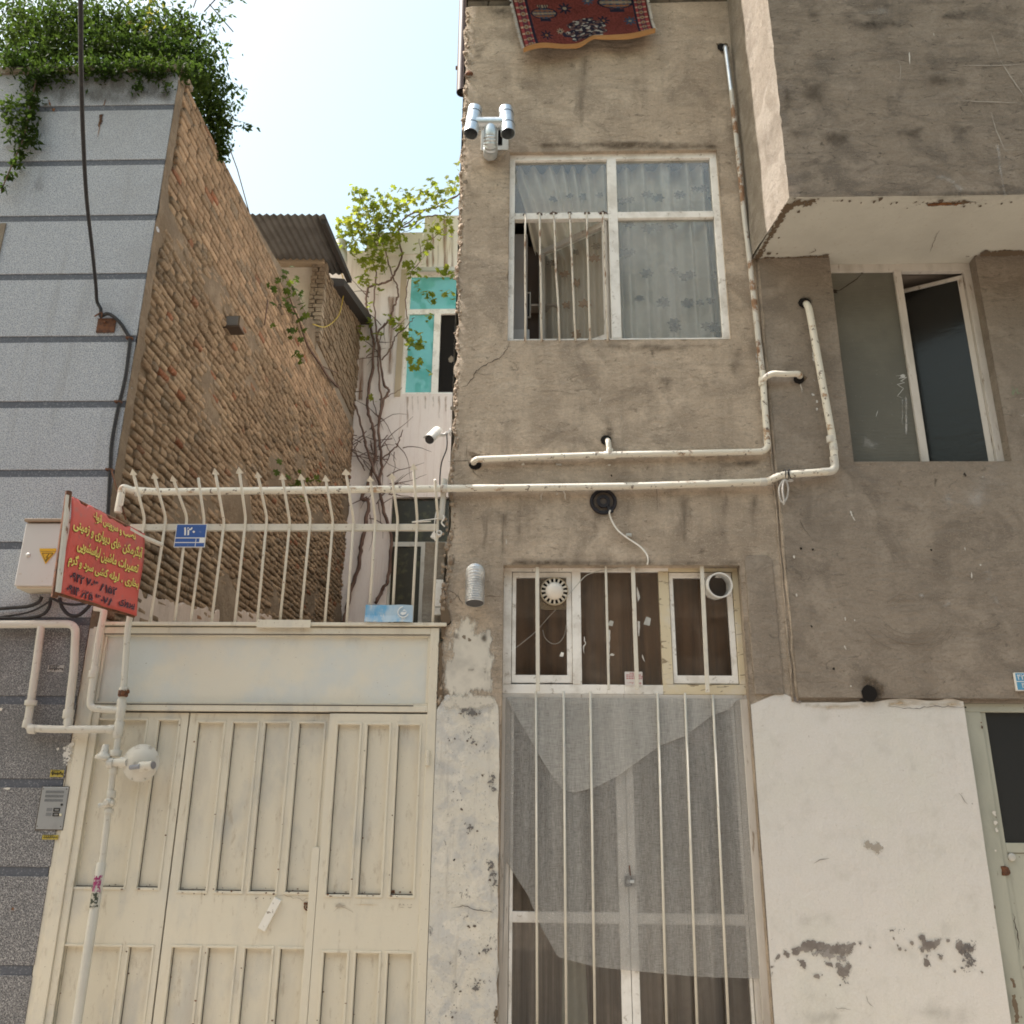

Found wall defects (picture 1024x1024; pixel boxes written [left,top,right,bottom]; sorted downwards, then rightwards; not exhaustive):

peeling [425,11,500,1024]
peeling [865,840,883,854]
peeling [771,940,871,986]
peeling [890,928,984,973]